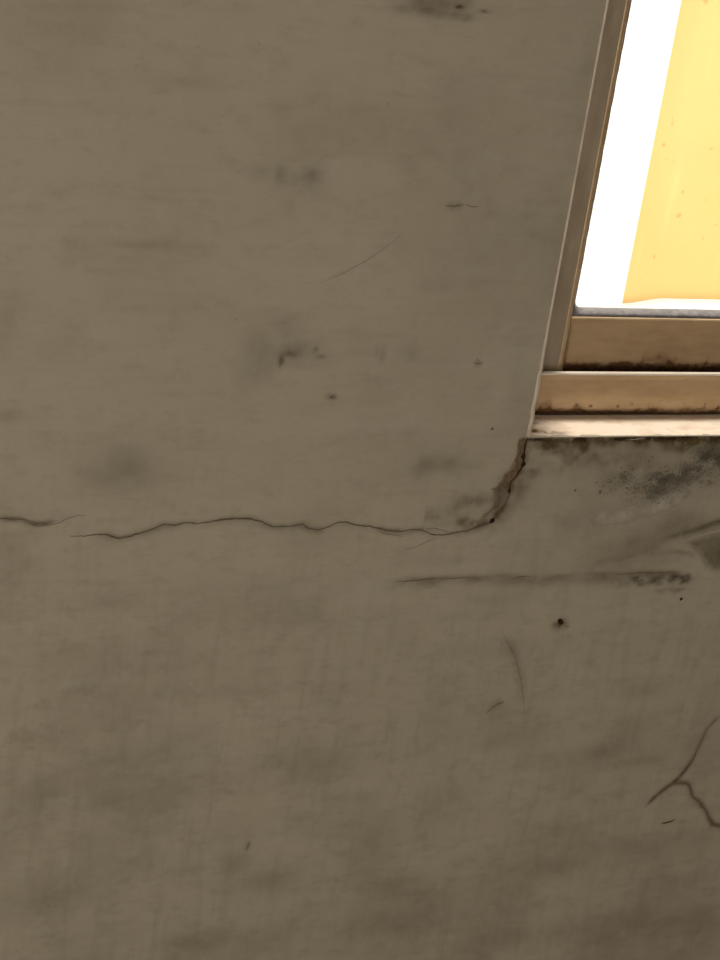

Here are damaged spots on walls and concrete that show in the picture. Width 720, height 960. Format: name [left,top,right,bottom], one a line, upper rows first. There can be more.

crack [0,437,528,549]
leakage [575,438,589,453]
leakage [592,437,720,525]
crack [648,717,720,826]